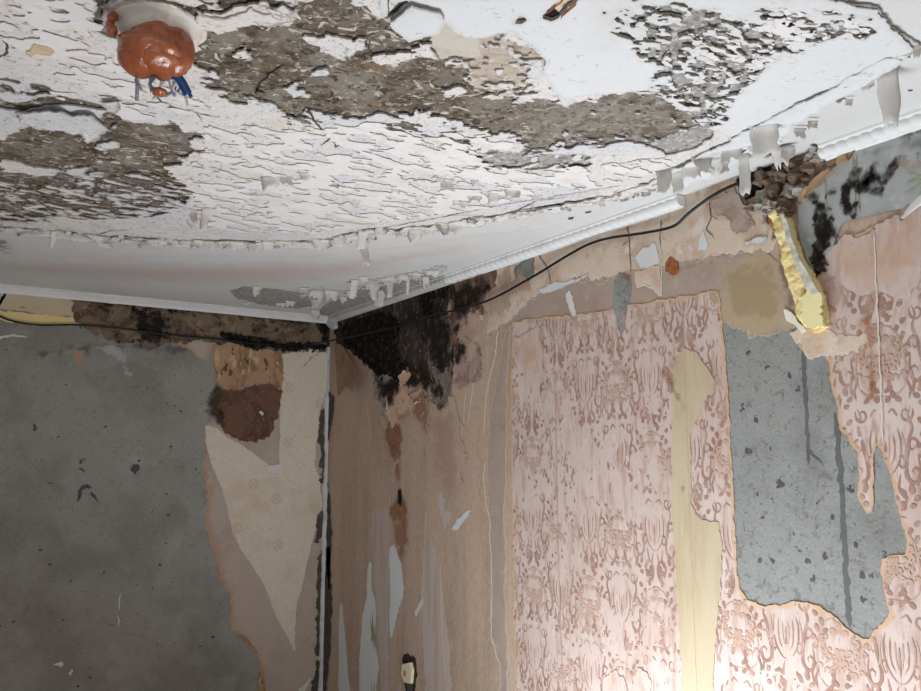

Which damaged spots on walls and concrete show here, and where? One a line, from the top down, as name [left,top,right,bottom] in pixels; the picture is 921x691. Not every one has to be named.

peeling [0,0,921,336]
leakage [808,158,921,301]
flaking render [207,383,283,444]
leakage [30,265,531,514]
spalling [722,323,907,639]
spalling [402,653,418,691]